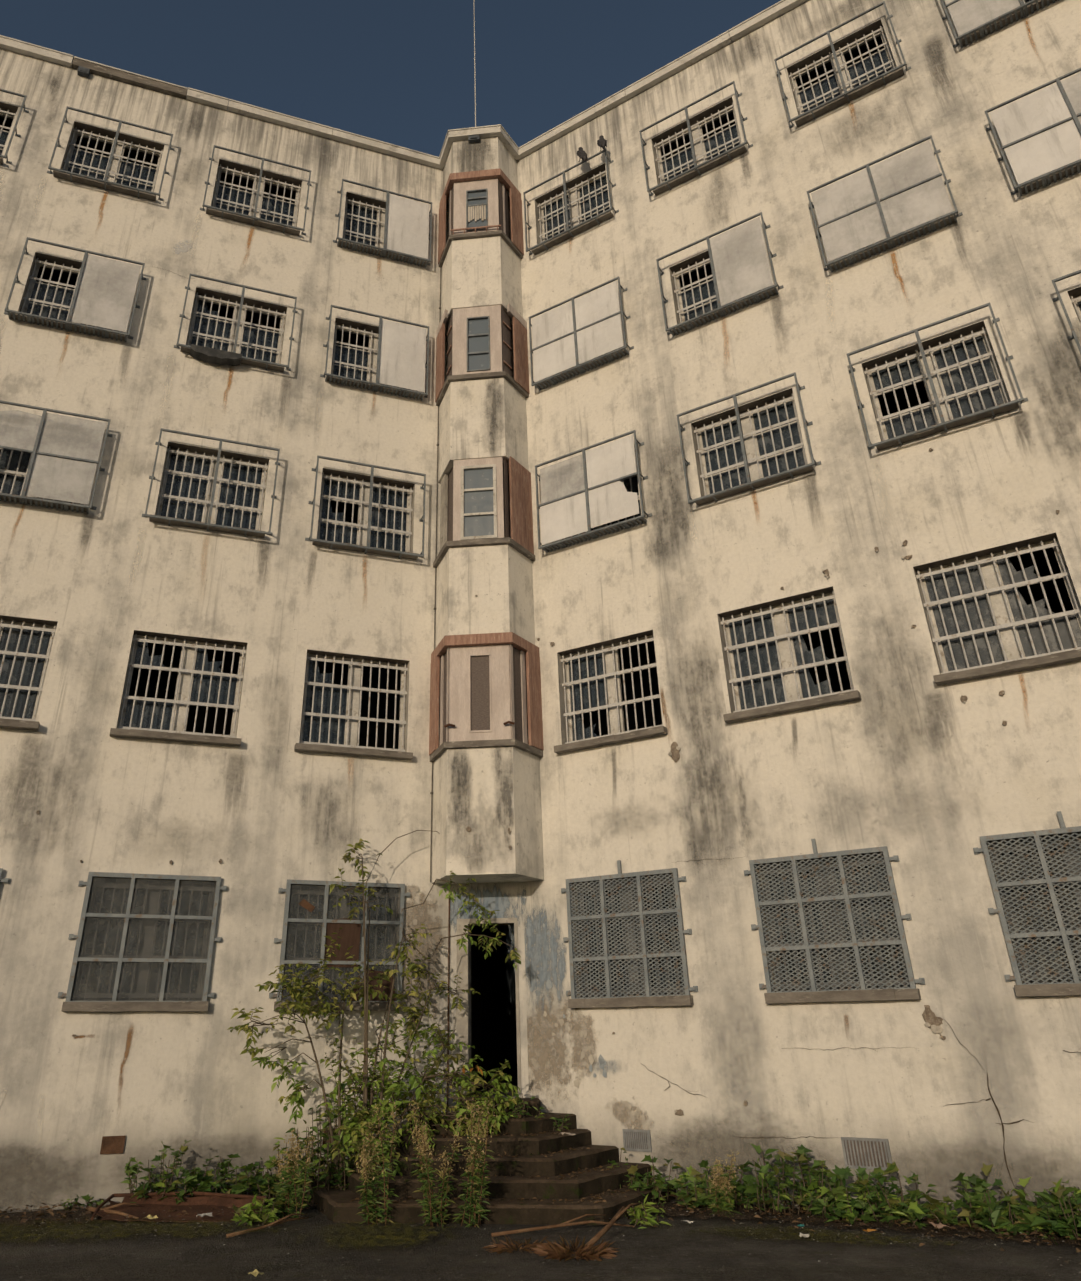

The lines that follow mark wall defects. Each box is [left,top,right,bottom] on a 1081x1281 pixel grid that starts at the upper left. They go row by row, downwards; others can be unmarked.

damp [654,454,688,555]
damp [452,754,470,819]
damp [496,751,513,821]
damp [690,768,744,864]
spalling [922,1005,946,1040]
rust [120,1029,133,1087]
crack [944,1019,1030,1189]